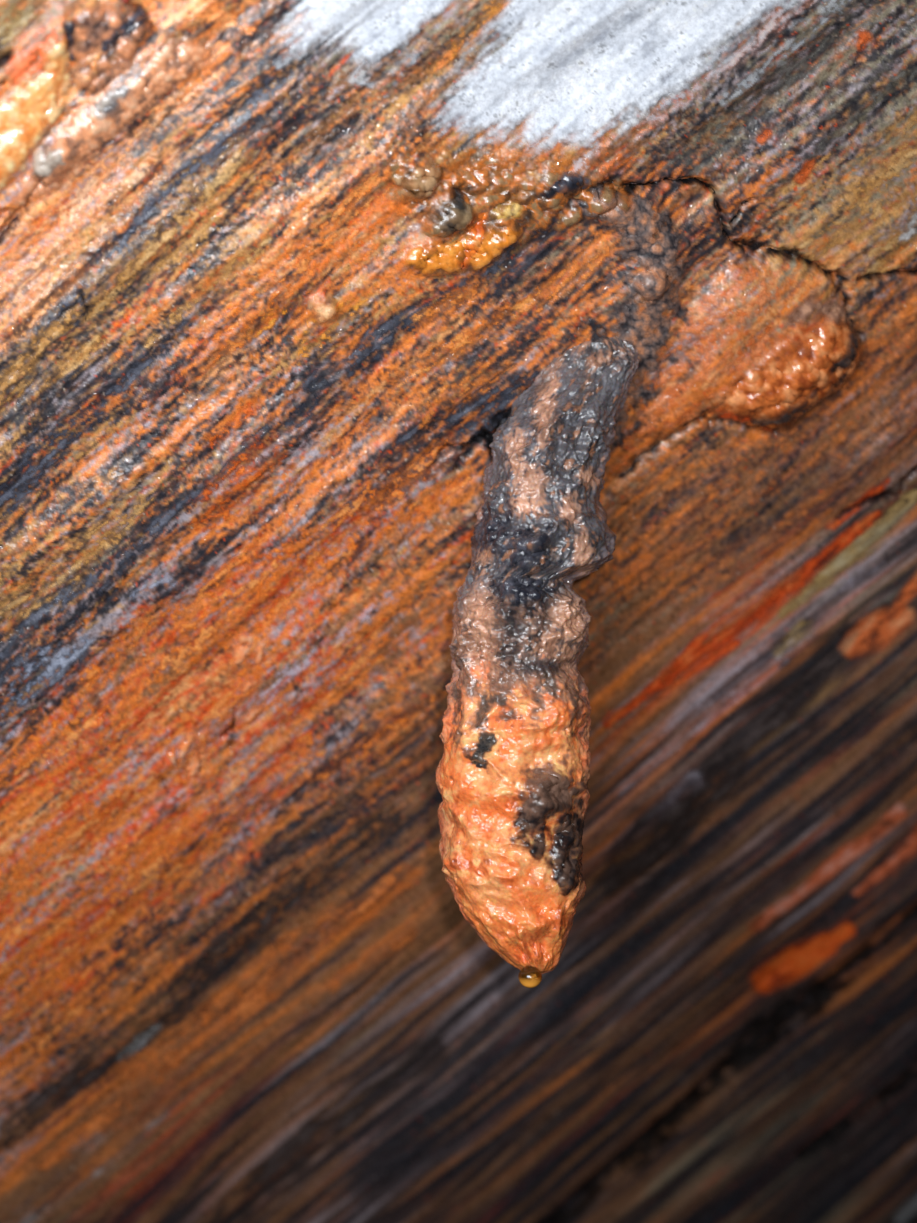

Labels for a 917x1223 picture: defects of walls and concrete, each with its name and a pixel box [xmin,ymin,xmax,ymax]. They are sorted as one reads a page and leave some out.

corrosion [154,0,256,66]
damp [435,0,798,172]
damp [662,0,887,176]
corrosion [0,86,199,349]
damp [0,0,451,415]
corrosion [213,175,477,362]
crack [572,177,917,333]
corrosion [0,436,449,786]
corrosion [604,478,890,727]
corrosion [842,575,917,657]
corrosion [751,804,906,929]
corrosion [752,923,855,992]